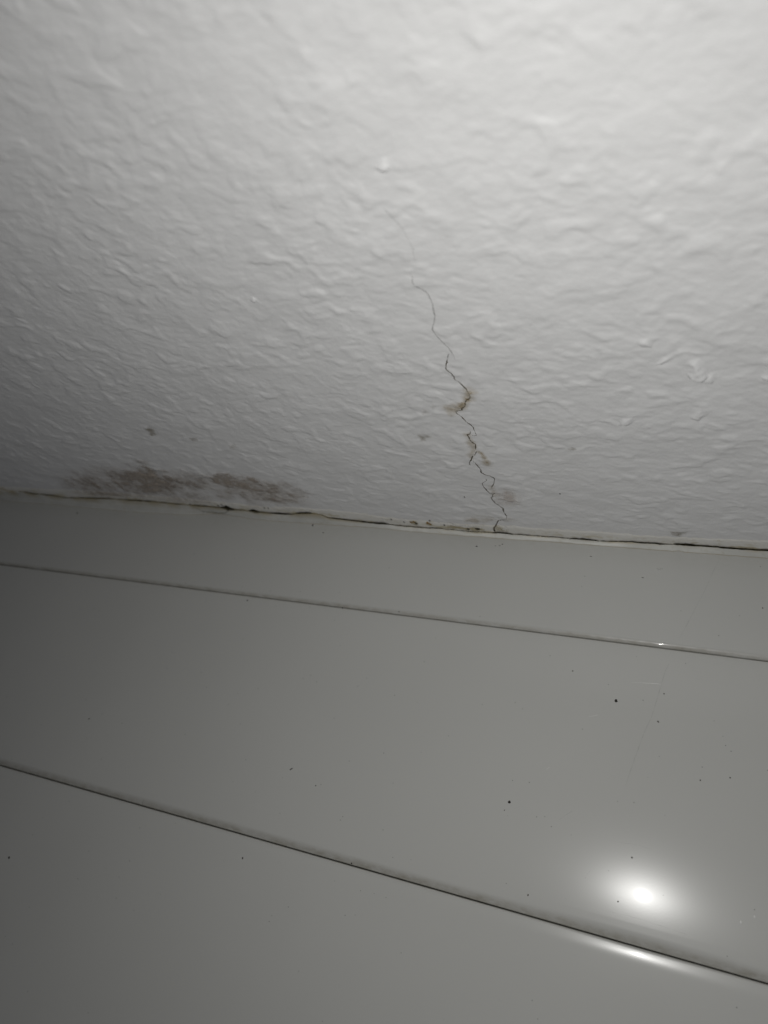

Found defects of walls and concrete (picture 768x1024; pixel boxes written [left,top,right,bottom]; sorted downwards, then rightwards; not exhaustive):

crack [19,286,768,551]